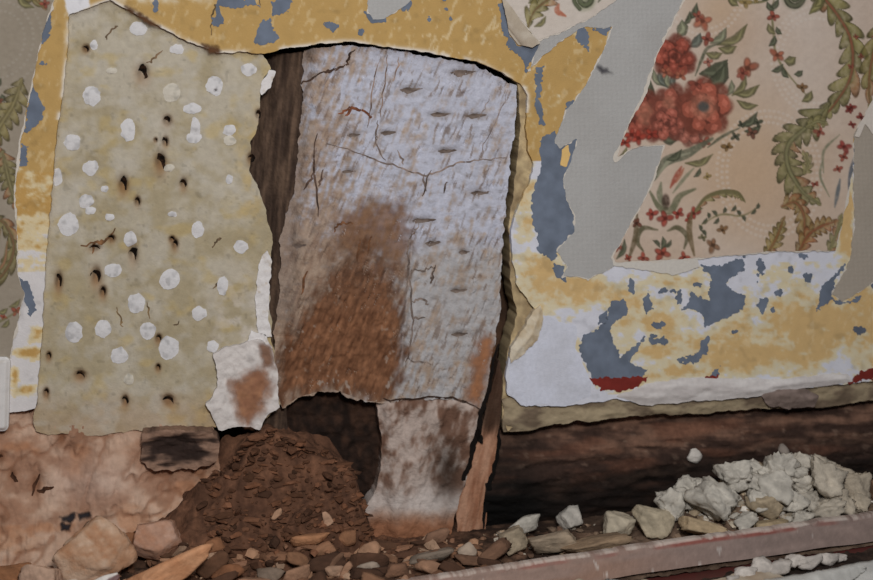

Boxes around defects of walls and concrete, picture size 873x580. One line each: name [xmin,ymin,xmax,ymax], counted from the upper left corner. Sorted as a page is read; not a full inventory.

crack [301,50,355,85]
crack [304,55,508,260]
peeling [498,3,577,283]
flaking render [19,0,379,497]
crack [300,271,308,295]
damp [228,205,409,425]
flaking render [508,255,746,407]
peeling [756,258,766,283]
peeling [756,289,783,315]
peeling [788,253,812,283]
peeling [816,263,861,311]
peeling [848,368,873,384]